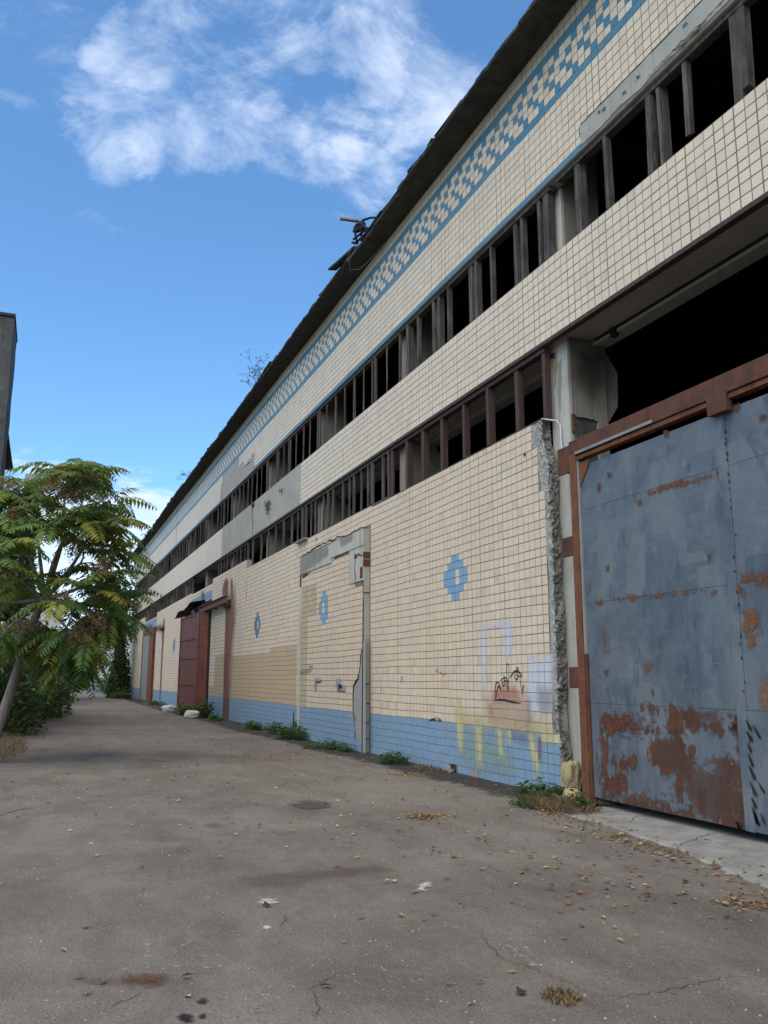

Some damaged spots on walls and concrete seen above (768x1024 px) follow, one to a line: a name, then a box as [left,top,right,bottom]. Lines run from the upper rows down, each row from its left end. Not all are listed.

corrosion [638,471,719,505]
spalling [530,419,572,764]
corrosion [737,571,768,649]
spalling [335,633,366,753]
corrosion [595,690,745,829]